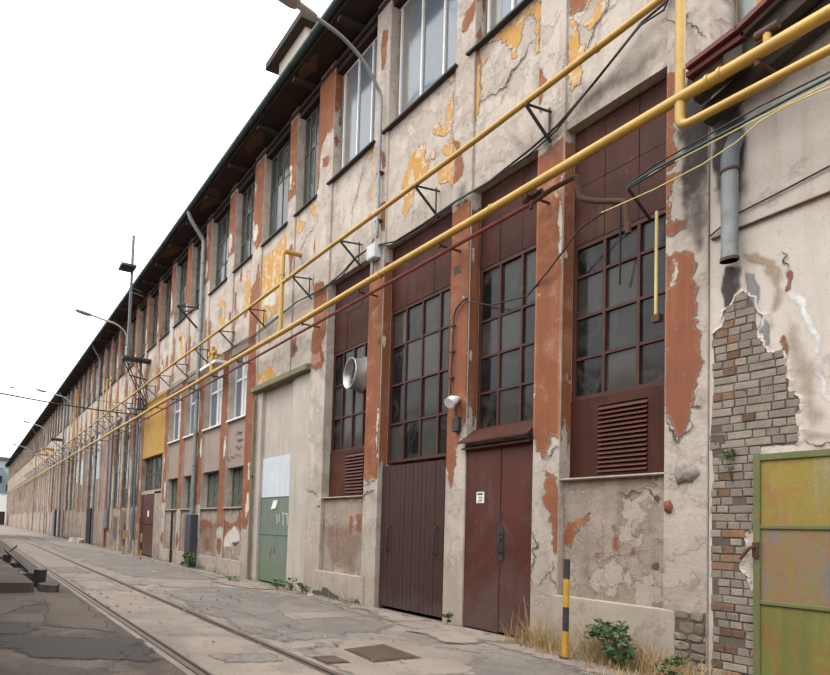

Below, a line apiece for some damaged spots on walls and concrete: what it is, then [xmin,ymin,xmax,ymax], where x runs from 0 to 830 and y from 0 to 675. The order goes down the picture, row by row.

peeling [462,0,541,119]
crack [480,42,532,101]
peeling [562,0,607,93]
peeling [401,94,464,215]
peeling [72,68,343,554]
peeling [533,136,575,460]
leakage [721,266,770,349]
leakage [748,254,780,310]
leakage [790,292,830,401]
peeling [541,471,590,554]
flaking render [653,495,673,513]
flaking render [664,250,806,675]